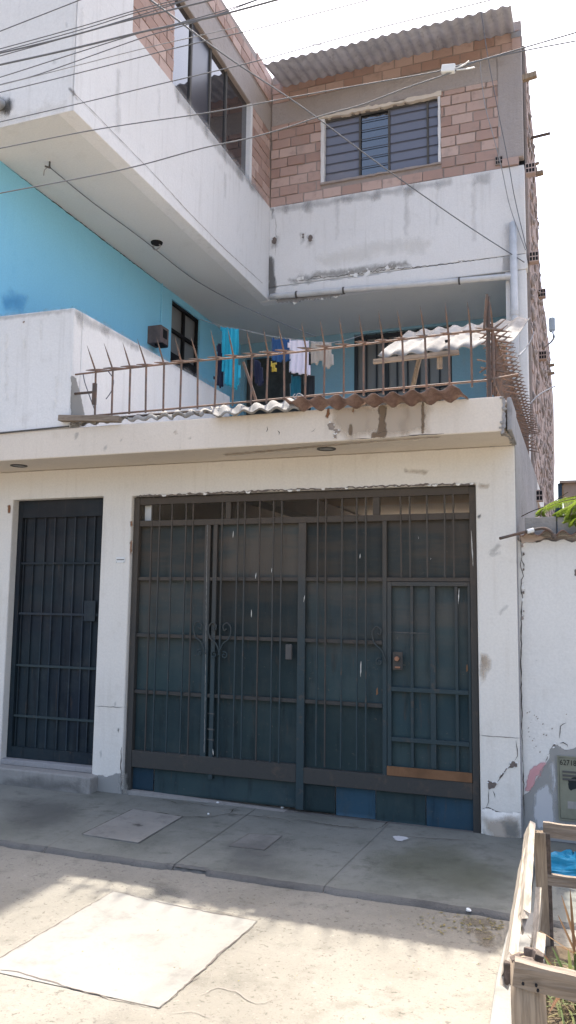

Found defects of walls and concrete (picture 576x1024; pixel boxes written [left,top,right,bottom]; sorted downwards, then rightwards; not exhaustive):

crack [482,539,536,815]